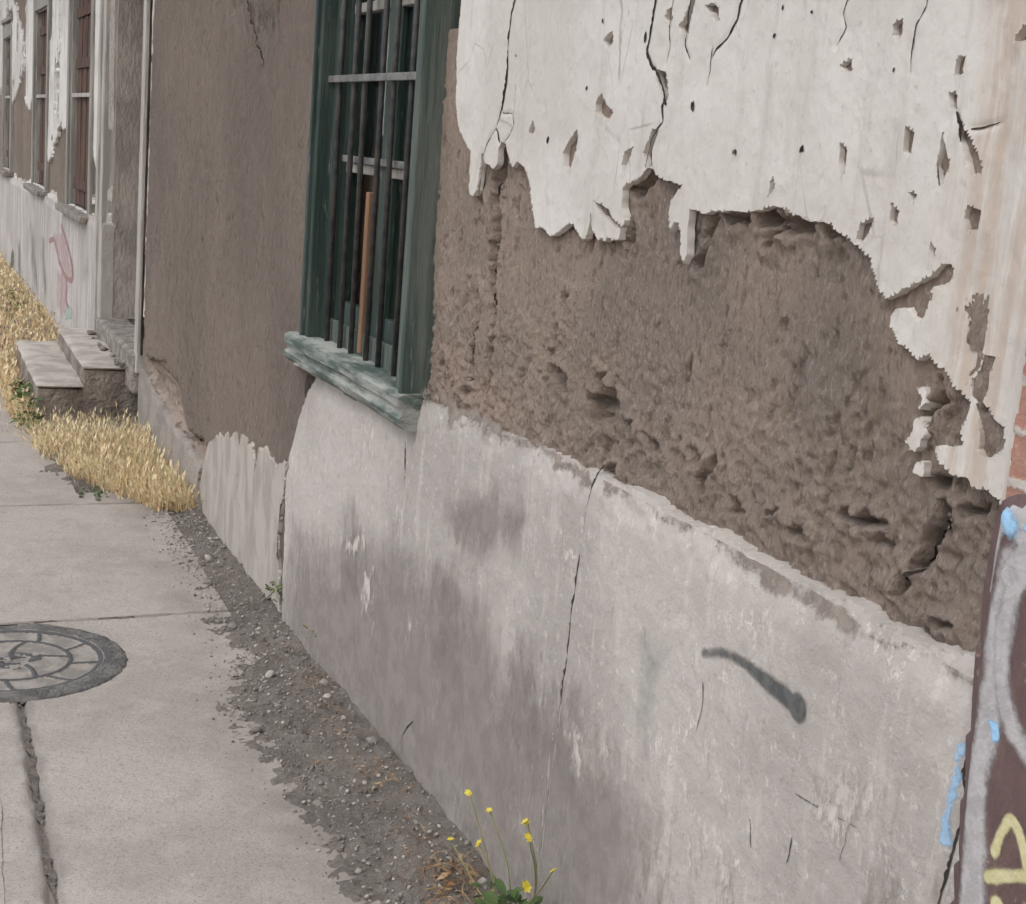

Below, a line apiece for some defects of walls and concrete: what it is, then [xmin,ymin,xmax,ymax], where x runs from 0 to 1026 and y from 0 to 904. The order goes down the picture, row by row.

spalling [0,71,32,181]
spalling [8,0,27,42]
crack [477,0,516,201]
crack [645,0,743,166]
spalling [420,28,1005,652]
flaking render [148,359,289,613]
crack [276,468,289,614]
crack [558,555,580,723]
crack [959,761,967,797]
crack [937,824,960,904]